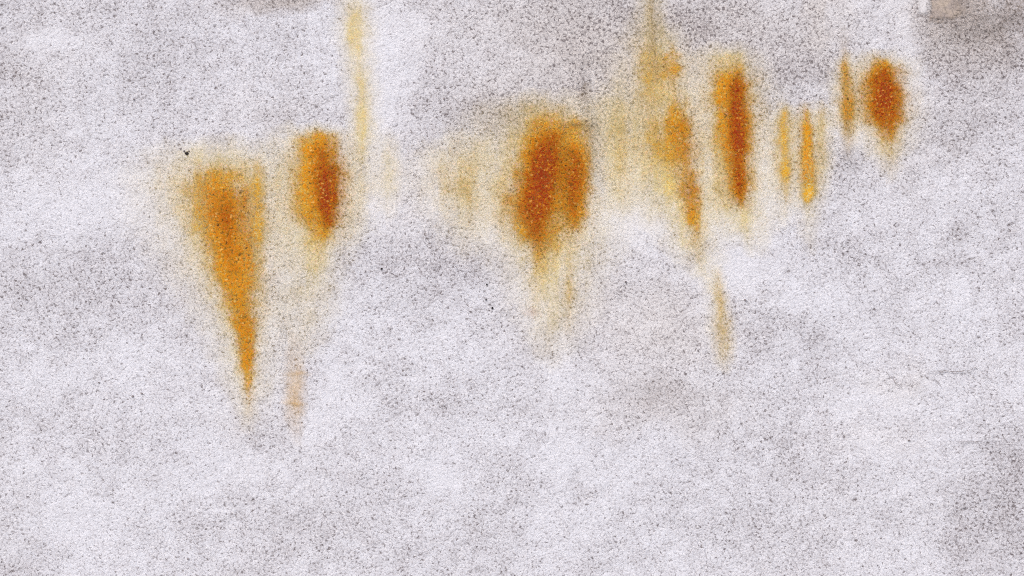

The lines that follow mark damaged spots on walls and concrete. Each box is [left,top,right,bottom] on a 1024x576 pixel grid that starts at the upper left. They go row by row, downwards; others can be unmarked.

corrosion [179,155,266,397]
corrosion [290,130,350,277]
corrosion [497,108,593,300]
corrosion [639,39,755,245]
corrosion [776,107,824,204]
corrosion [838,58,906,146]